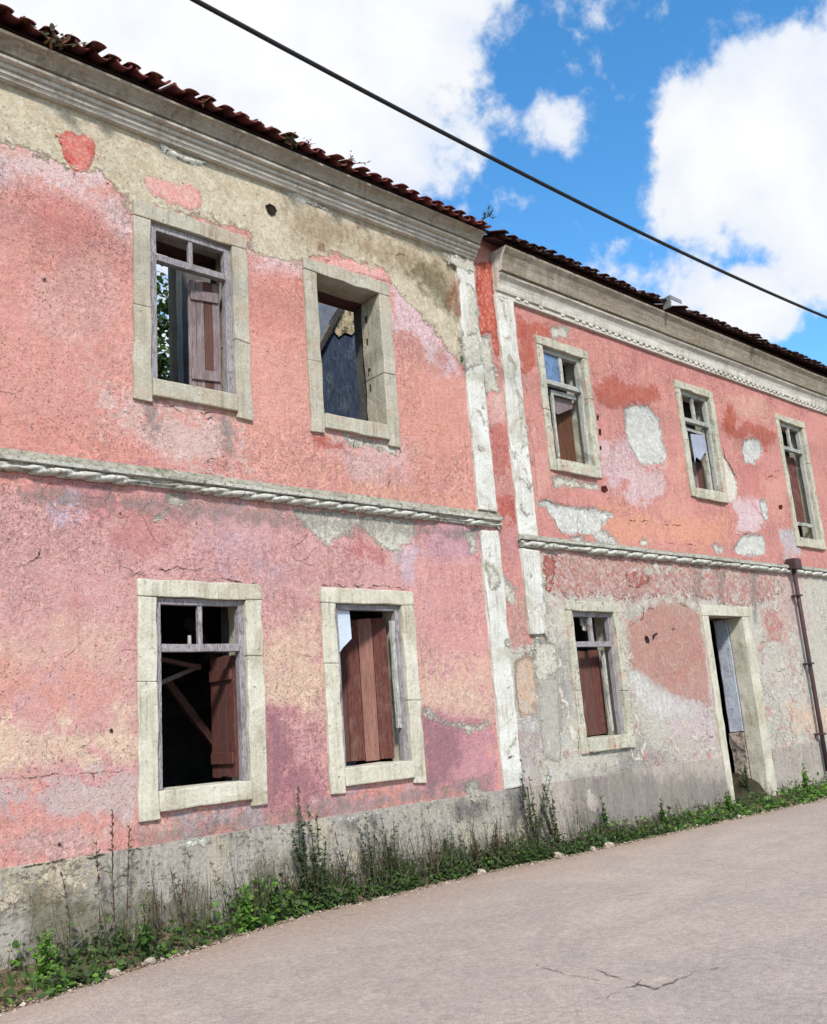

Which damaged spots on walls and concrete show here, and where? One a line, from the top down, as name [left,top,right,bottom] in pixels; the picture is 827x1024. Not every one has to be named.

flaking render [0,82,530,451]
flaking render [623,403,667,466]
flaking render [275,506,417,555]
flaking render [462,523,518,606]
peeling [505,437,817,779]